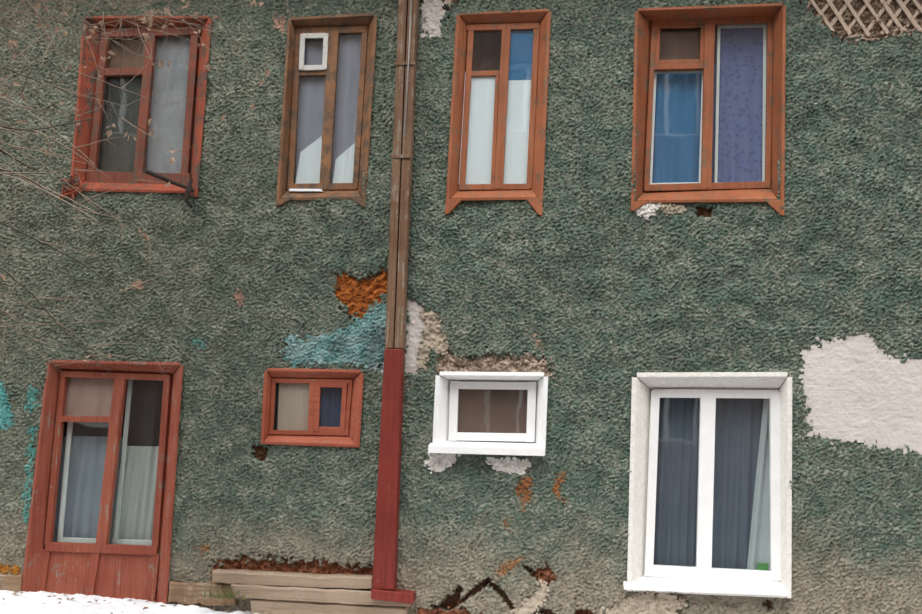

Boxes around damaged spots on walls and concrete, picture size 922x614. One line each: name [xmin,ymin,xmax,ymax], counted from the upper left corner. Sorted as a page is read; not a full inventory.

peeling [279,268,388,374]
spalling [405,299,555,381]
flaking render [798,332,922,455]
spalling [195,544,373,578]
spalling [532,560,559,588]
flaking render [414,585,482,614]
crack [457,577,556,614]